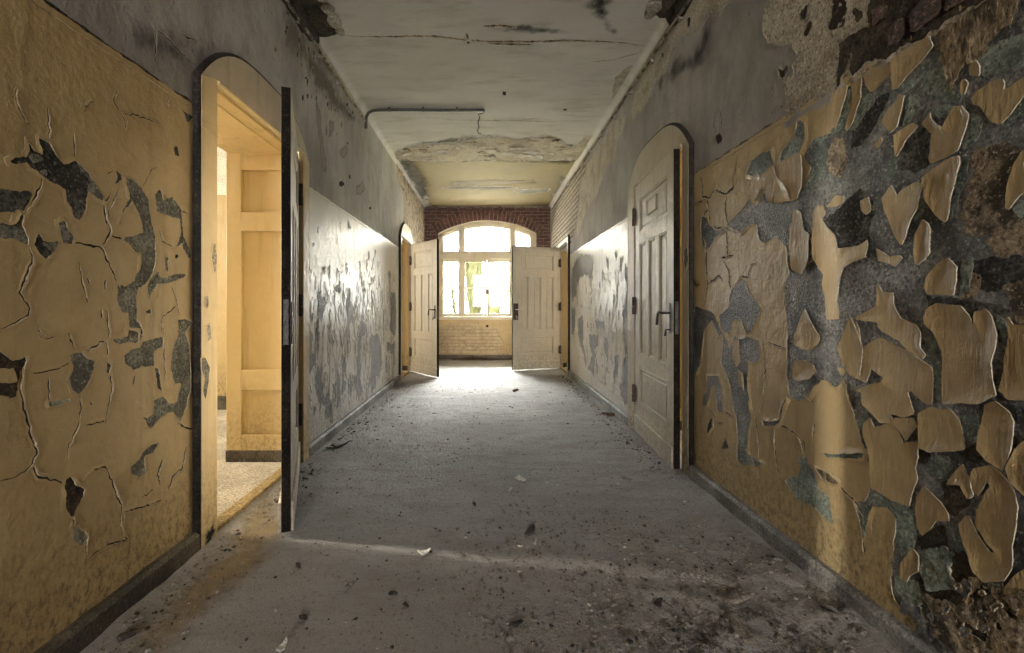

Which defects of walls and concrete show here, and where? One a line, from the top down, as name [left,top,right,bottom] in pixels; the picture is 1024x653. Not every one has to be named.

crack [12,88,170,158]
crack [345,24,644,63]
crack [0,164,193,563]
peeling [0,133,211,481]
peeling [309,250,397,423]
peeling [396,137,628,407]
peeling [683,0,1024,653]
peeling [60,474,90,548]